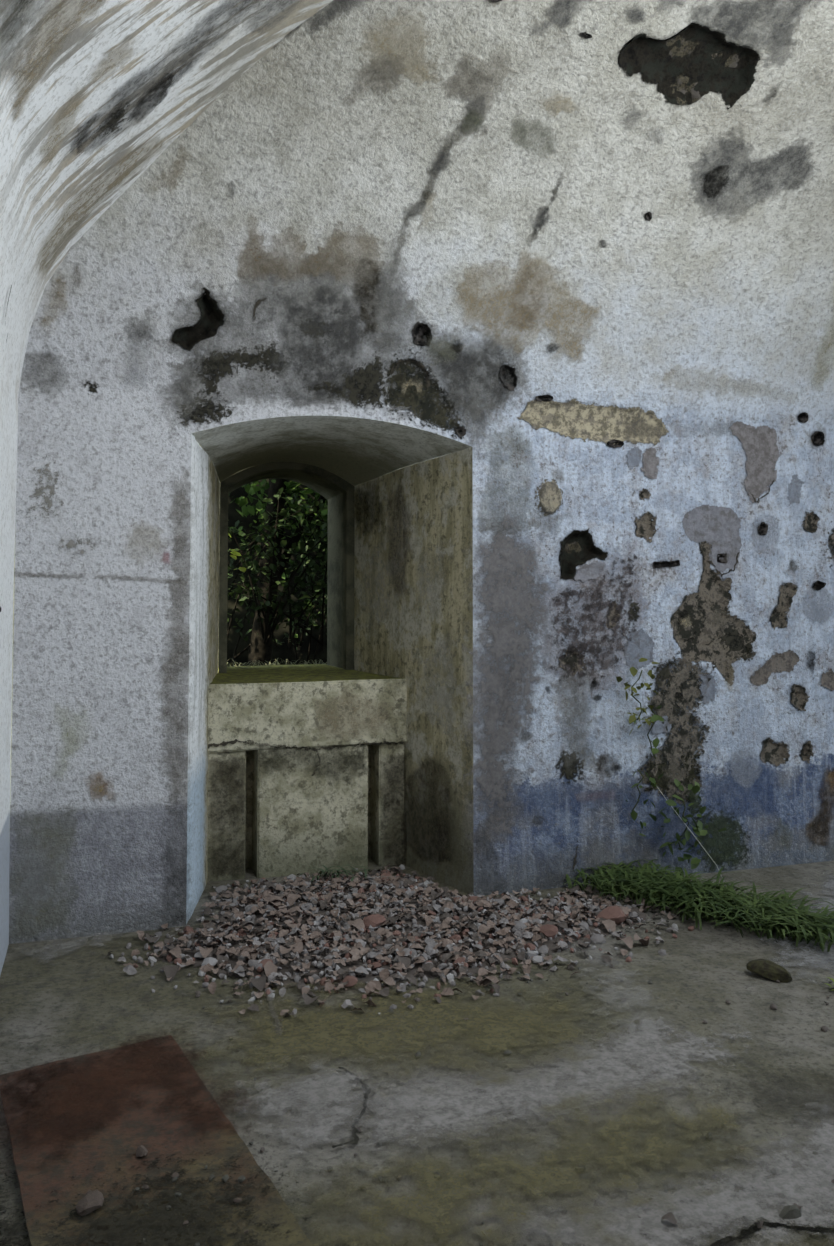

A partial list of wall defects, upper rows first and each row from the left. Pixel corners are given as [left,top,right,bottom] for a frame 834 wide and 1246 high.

water stain [0,0,105,119]
water stain [73,0,296,151]
spalling [619,23,760,109]
water stain [693,133,812,211]
spalling [171,287,228,352]
water stain [173,258,598,439]
spalling [517,395,669,542]
peeling [730,421,834,567]
spalling [546,505,834,805]
water stain [555,747,621,785]
crack [332,1067,371,1148]
crack [702,1216,834,1246]